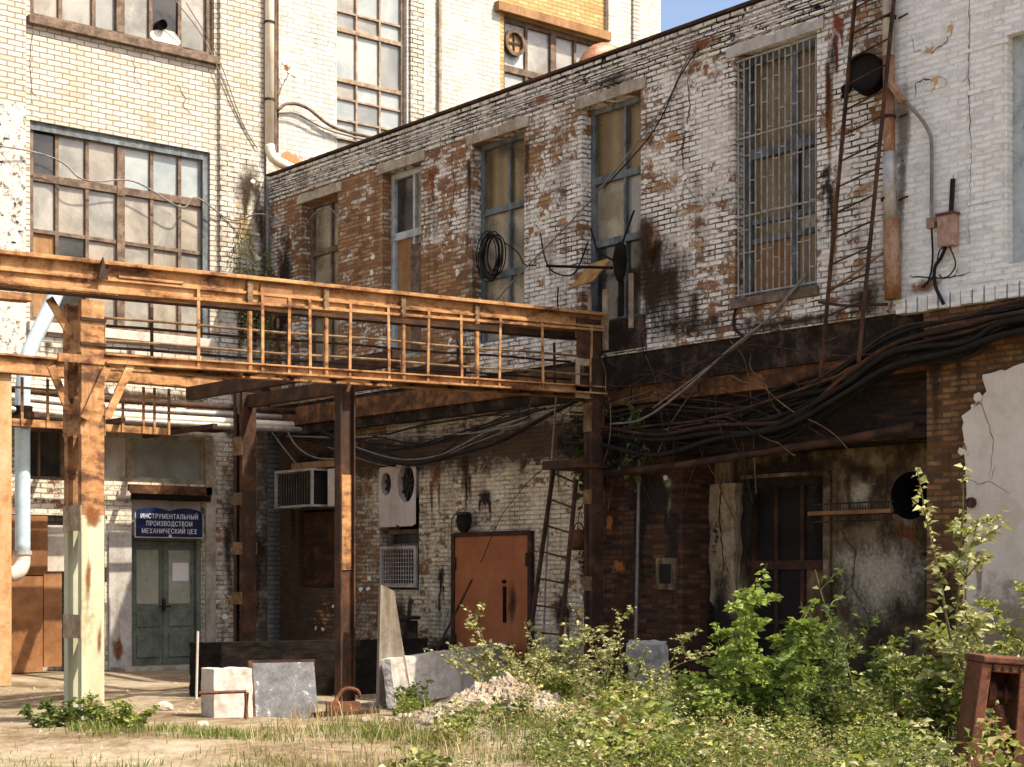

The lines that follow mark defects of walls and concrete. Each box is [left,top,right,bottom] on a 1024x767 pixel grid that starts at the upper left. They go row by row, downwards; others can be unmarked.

peeling [652,123,693,150]
rust [821,14,844,254]
crack [912,0,972,239]
water stain [243,185,292,280]
peeling [431,219,460,296]
peeling [539,183,573,230]
water stain [634,218,718,338]
peeling [643,169,710,216]
water stain [274,315,299,366]
crack [968,406,1008,493]
water stain [837,545,923,613]
rust [98,631,122,659]